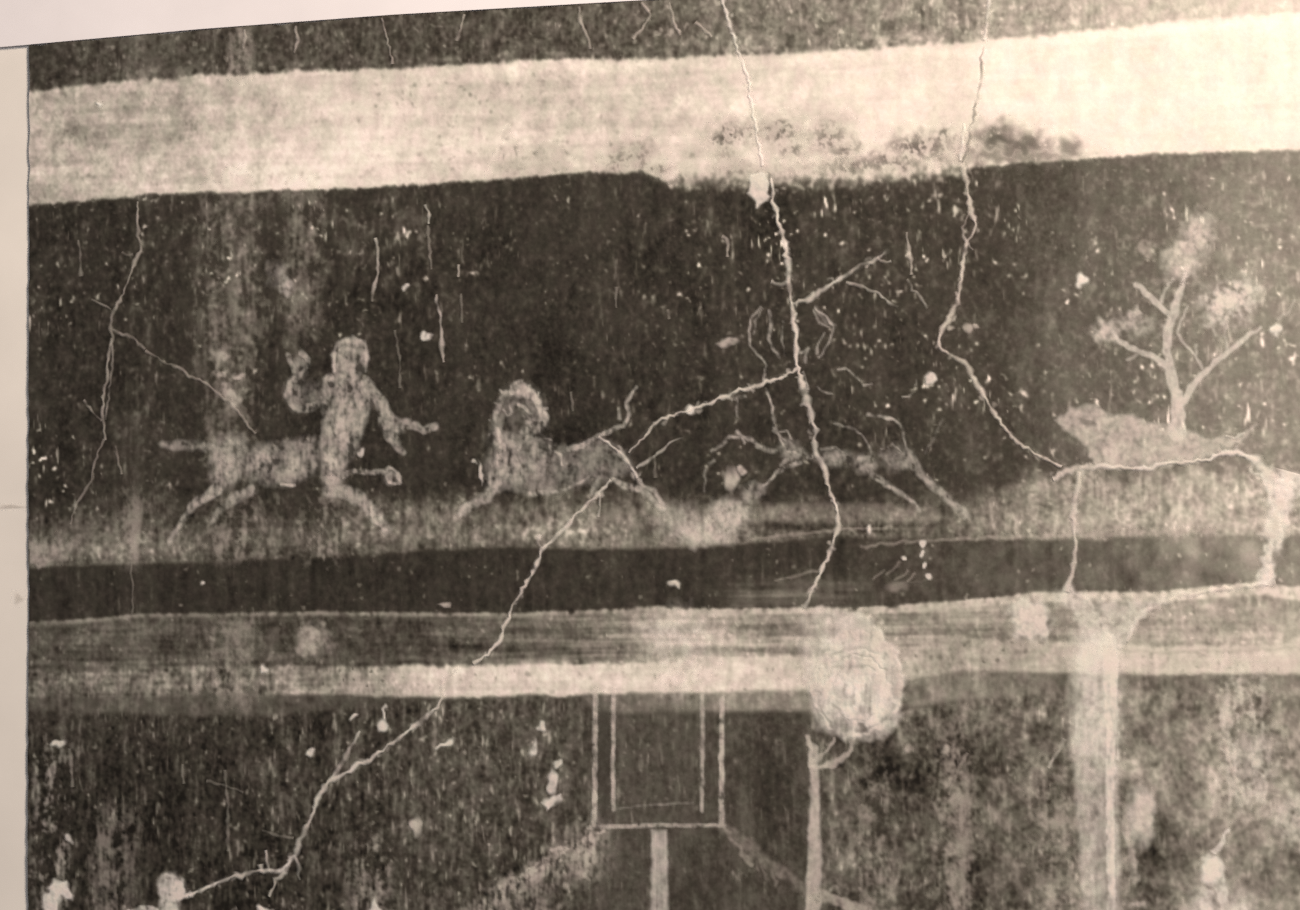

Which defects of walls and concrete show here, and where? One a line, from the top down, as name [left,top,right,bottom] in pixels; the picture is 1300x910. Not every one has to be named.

crack [605,0,839,589]
crack [938,104,1300,586]
crack [473,486,606,664]
crack [306,700,441,827]
peeling [44,881,72,910]
crack [189,861,290,896]